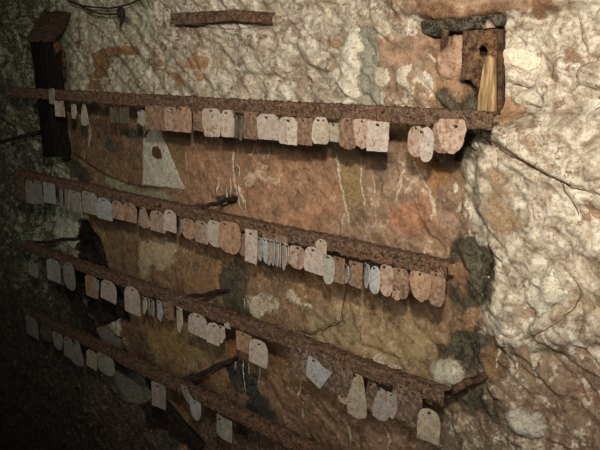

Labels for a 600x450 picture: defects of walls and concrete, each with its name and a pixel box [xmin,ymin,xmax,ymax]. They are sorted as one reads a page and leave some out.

corrosion [336,154,366,212]
corrosion [410,156,451,194]
crack [485,138,590,216]
crack [306,295,345,337]
water stain [448,236,496,320]
crack [505,270,584,340]
water stain [437,326,493,377]
water stain [455,383,501,421]